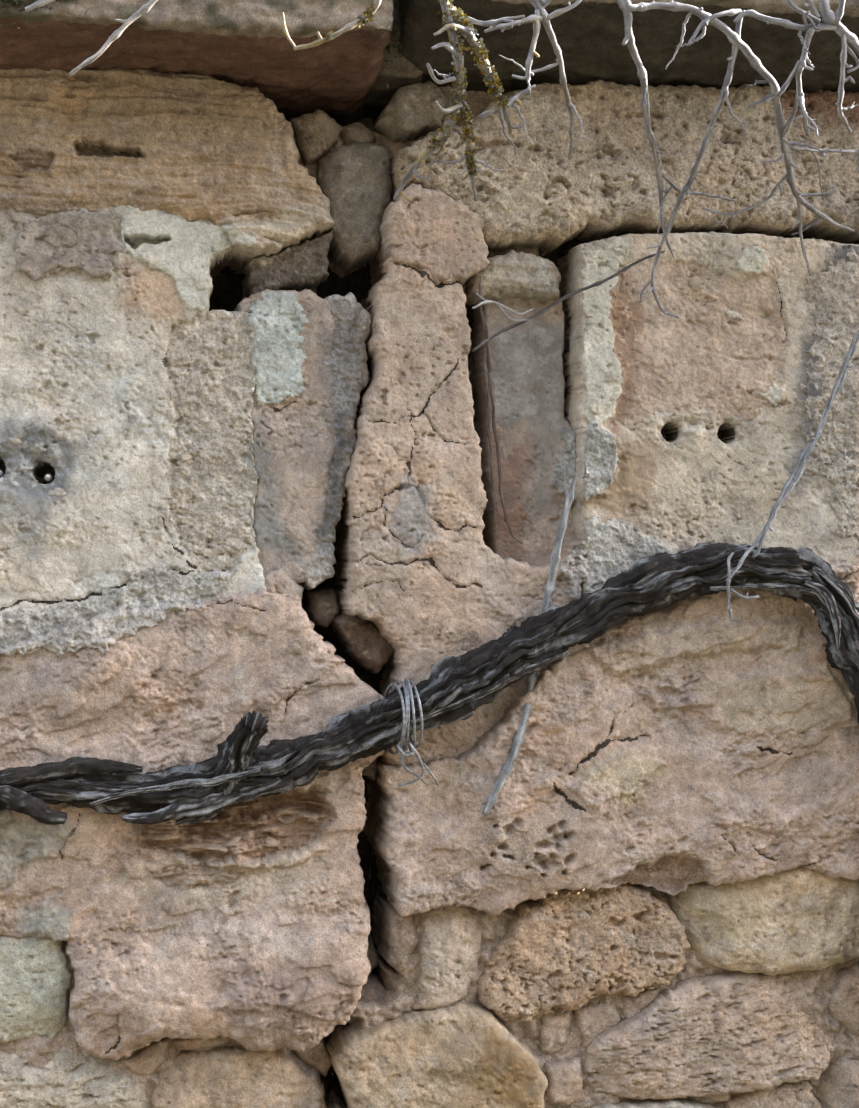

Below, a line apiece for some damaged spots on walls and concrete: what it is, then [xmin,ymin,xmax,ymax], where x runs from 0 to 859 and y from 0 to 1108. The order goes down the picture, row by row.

crack [372,108,384,130]
crack [209,266,246,312]
crack [301,260,482,695]
crack [357,775,389,973]
crack [320,1065,347,1108]